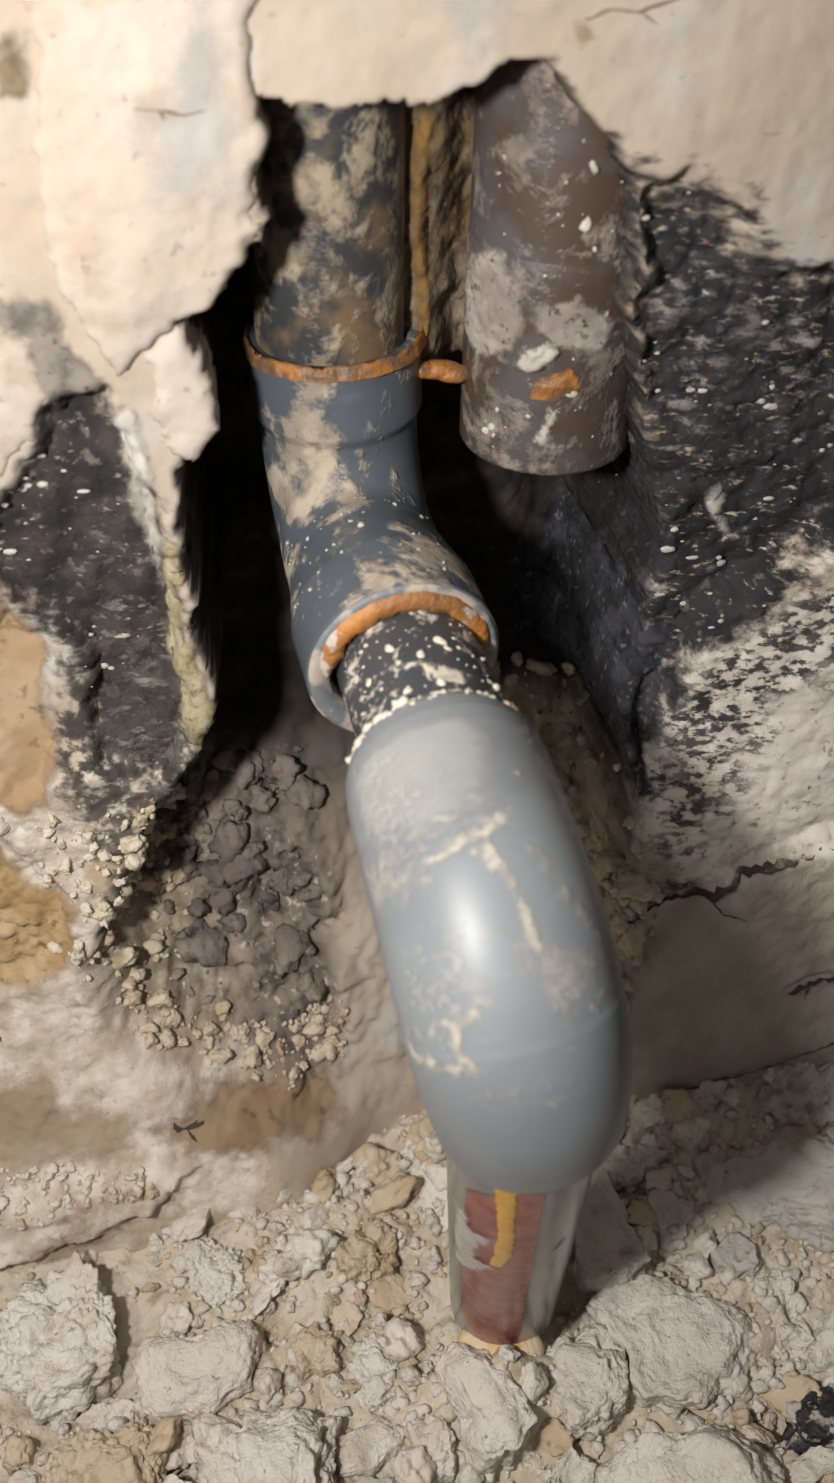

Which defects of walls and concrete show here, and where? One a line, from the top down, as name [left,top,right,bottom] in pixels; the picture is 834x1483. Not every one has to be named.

crack [584,0,673,24]
spalling [0,39,27,97]
spalling [0,284,220,794]
crack [628,847,834,924]
crack [787,977,834,1000]